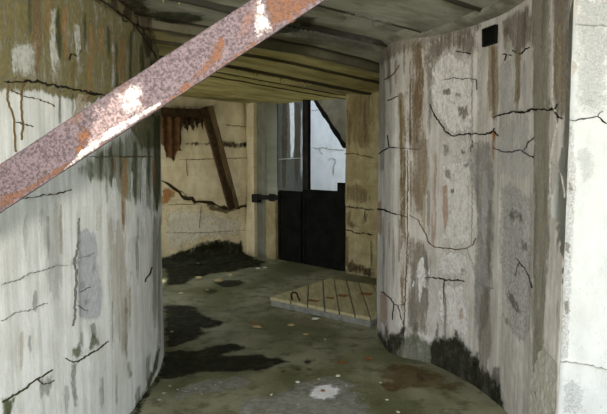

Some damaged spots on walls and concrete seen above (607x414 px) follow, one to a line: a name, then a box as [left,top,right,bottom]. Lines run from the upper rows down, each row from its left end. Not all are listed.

rust [200,39,257,76]
crack [4,79,105,152]
rust [76,127,89,154]
rust [161,116,184,161]
crack [313,46,607,324]
crack [161,180,247,233]
crack [4,252,95,284]
crack [1,303,48,321]
crack [66,341,109,363]
crack [2,369,55,402]